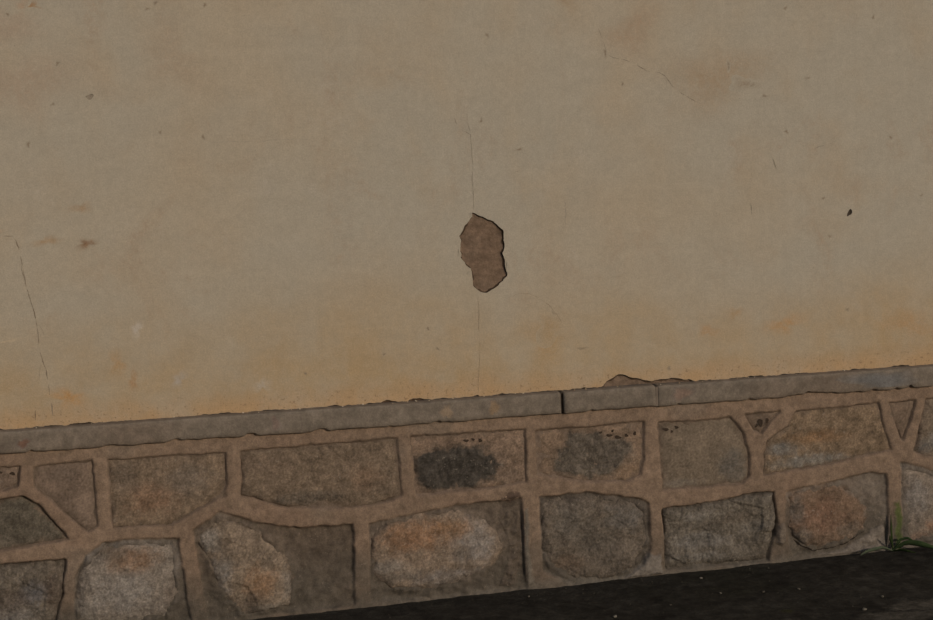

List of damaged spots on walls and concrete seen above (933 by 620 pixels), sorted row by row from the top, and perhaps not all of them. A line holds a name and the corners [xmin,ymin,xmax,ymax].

crack [8,236,53,418]
leakage [0,194,933,450]
flaking render [458,212,509,293]